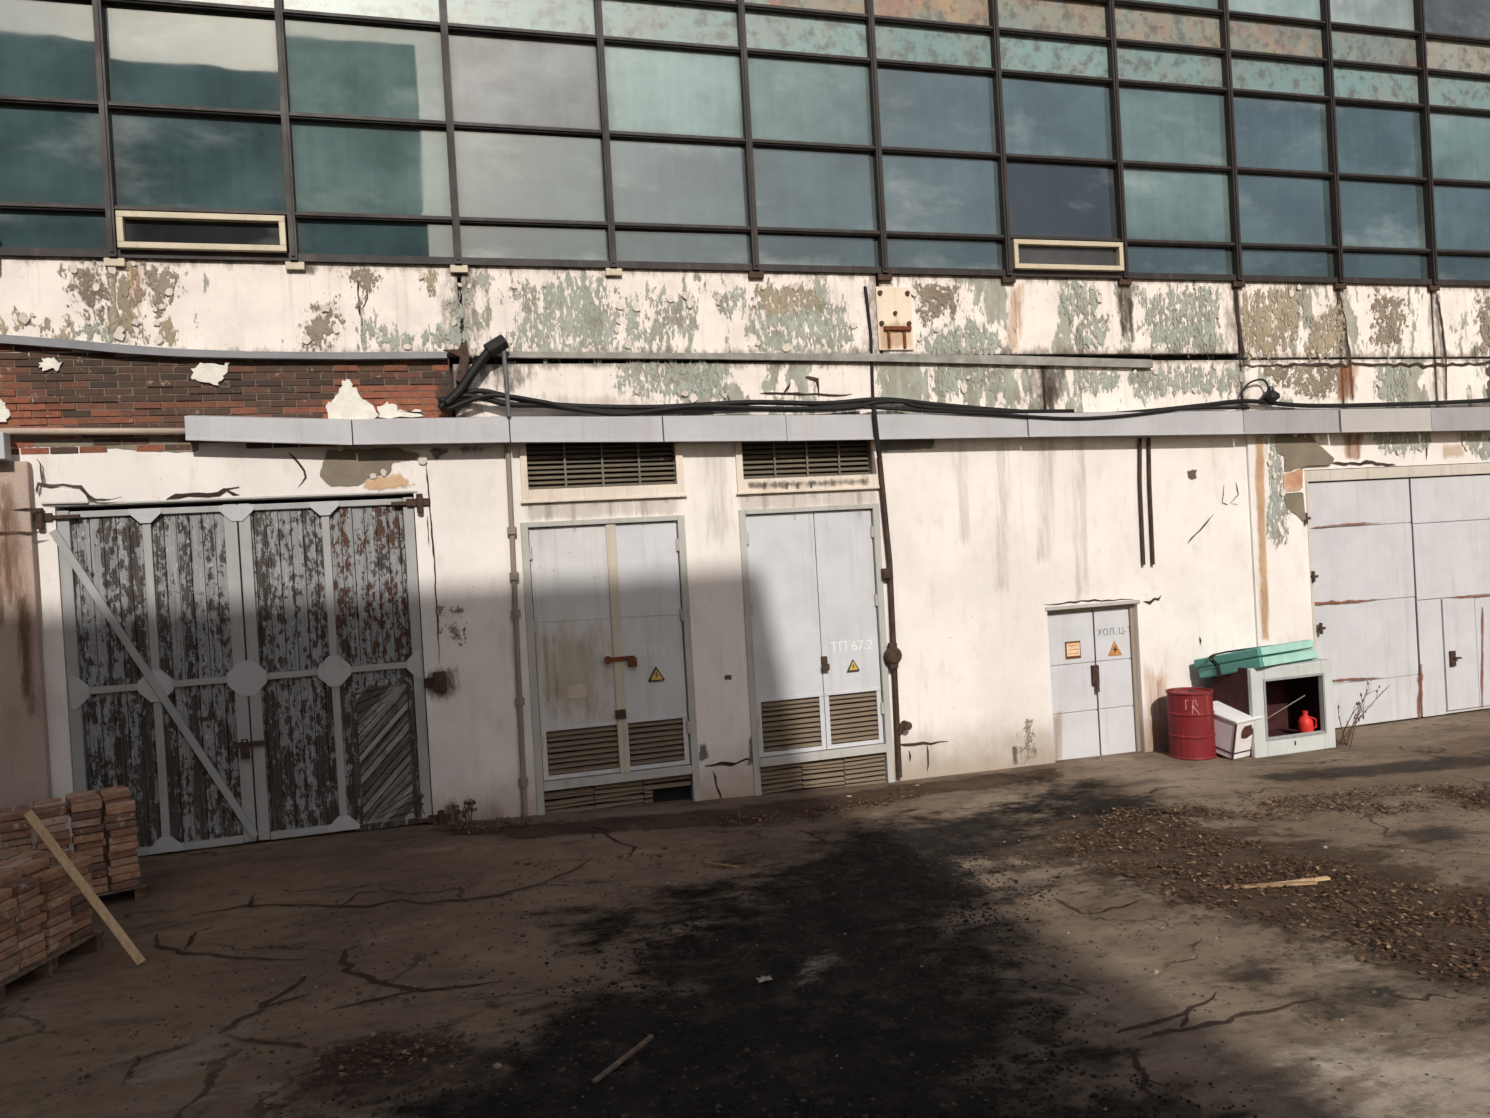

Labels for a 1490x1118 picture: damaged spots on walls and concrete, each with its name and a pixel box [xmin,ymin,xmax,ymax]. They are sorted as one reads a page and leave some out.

flaking render [0,257,480,455]